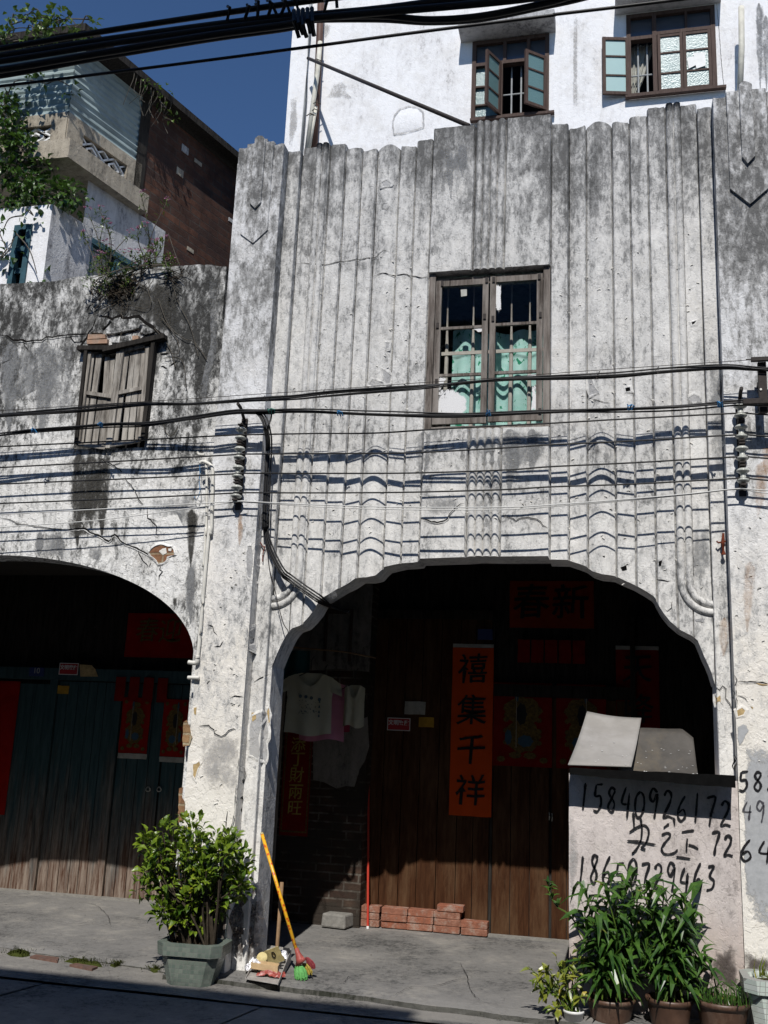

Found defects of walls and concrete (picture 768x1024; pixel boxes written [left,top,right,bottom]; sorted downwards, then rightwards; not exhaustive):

crack [299,250,429,278]
crack [2,314,176,368]
leakage [36,454,110,559]
crack [3,458,177,576]
spalling [147,542,178,567]
spalling [244,624,259,654]
crack [200,725,236,737]
spalling [178,702,272,823]